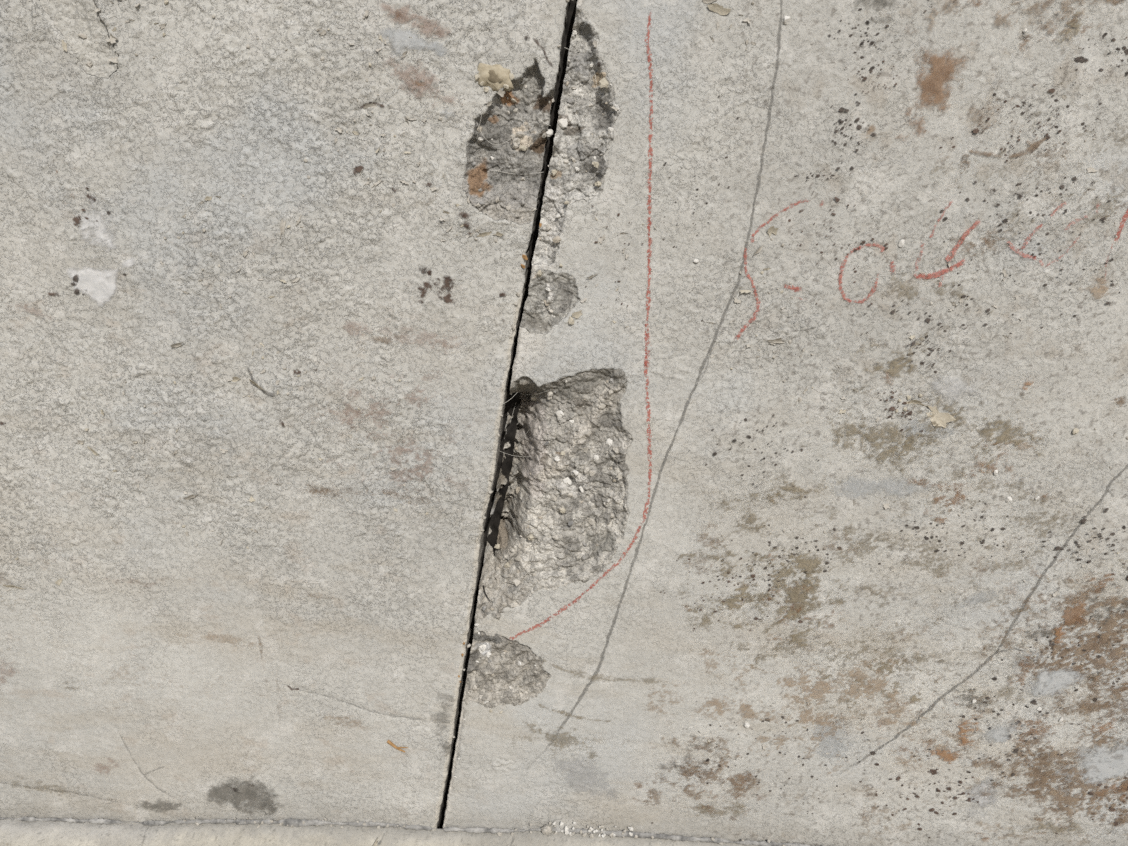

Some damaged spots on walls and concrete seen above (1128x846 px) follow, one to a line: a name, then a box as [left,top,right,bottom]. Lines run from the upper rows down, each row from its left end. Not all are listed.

spalling [439,4,621,335]
crack [438,0,577,829]
spalling [463,368,632,714]
crack [565,2,782,722]
rust [1055,602,1086,643]
leakage [209,782,276,813]